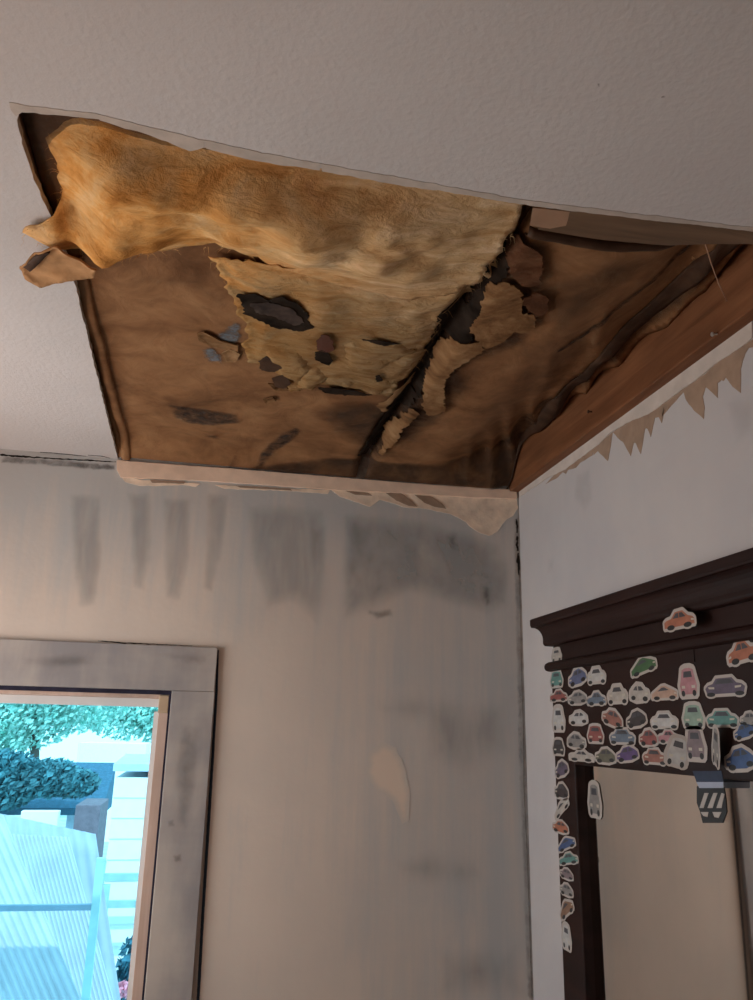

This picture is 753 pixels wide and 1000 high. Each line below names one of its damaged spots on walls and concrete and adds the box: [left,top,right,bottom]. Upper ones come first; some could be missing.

water stain [171,406,235,438]
water stain [246,388,557,489]